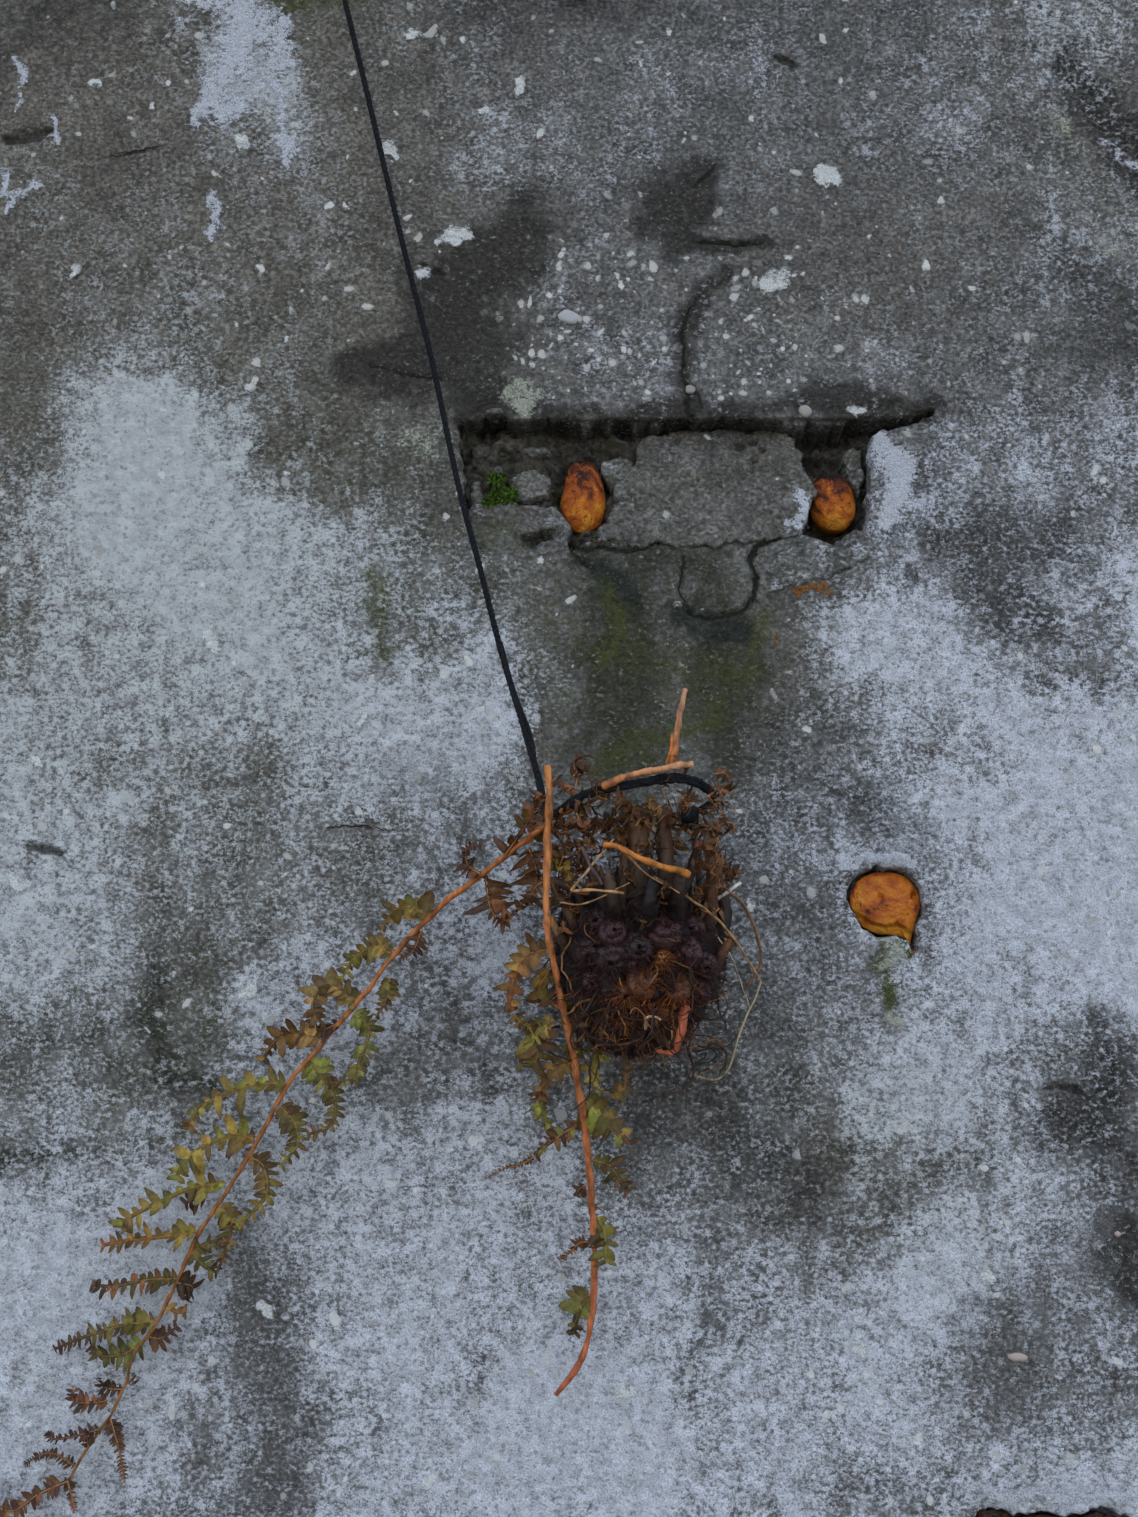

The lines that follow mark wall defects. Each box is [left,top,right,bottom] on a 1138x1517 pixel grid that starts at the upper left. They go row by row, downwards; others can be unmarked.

crack [700,239,763,247]
crack [680,298,703,418]
leakage [332,156,1072,564]
corrosion [560,460,606,534]
spalling [460,408,873,592]
corrosion [809,475,855,536]
leakage [990,586,1061,631]
corrosion [848,872,920,954]
leakage [1033,1010,1138,1167]
leakage [1092,1212,1138,1310]
corrosion [975,1507,1116,1517]